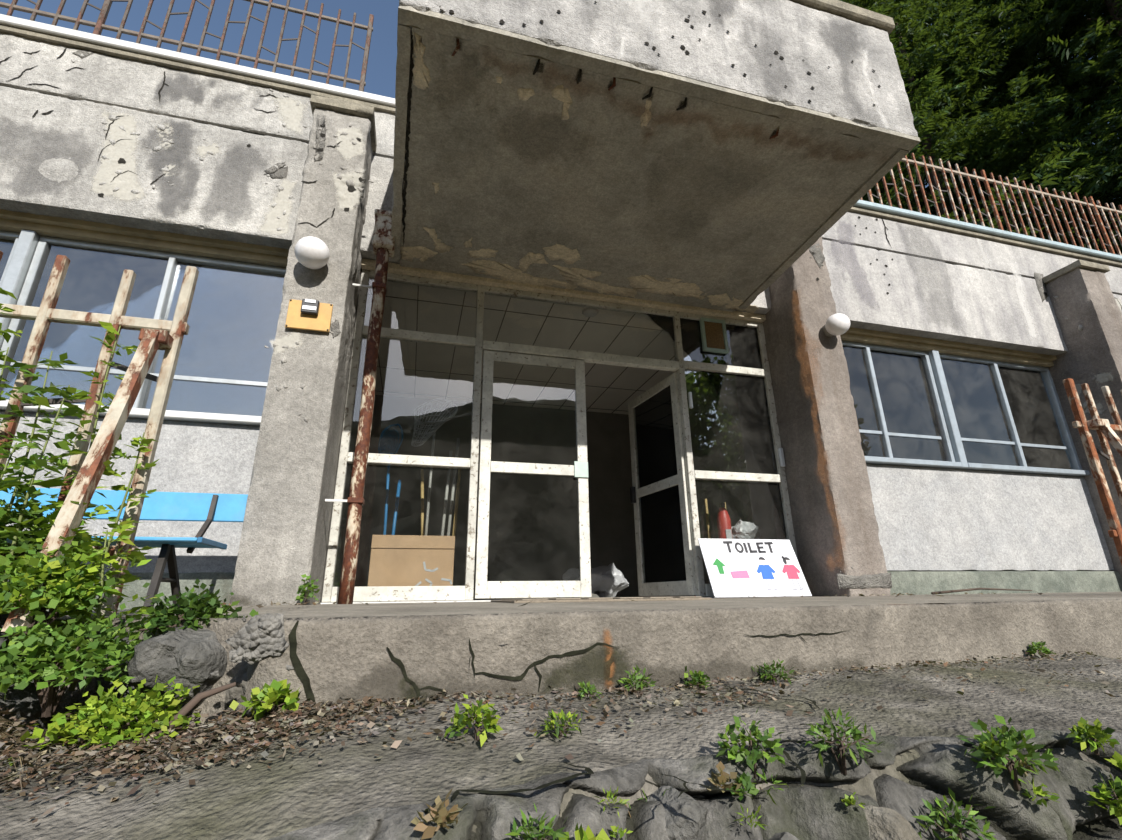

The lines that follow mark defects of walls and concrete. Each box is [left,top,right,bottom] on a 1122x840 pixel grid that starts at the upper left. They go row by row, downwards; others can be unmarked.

water stain [156,74,214,103]
peeling [92,112,175,200]
water stain [152,123,198,216]
peeling [253,88,374,211]
crack [402,35,414,245]
peeling [400,227,759,314]
crack [386,647,445,703]
crack [469,638,617,688]